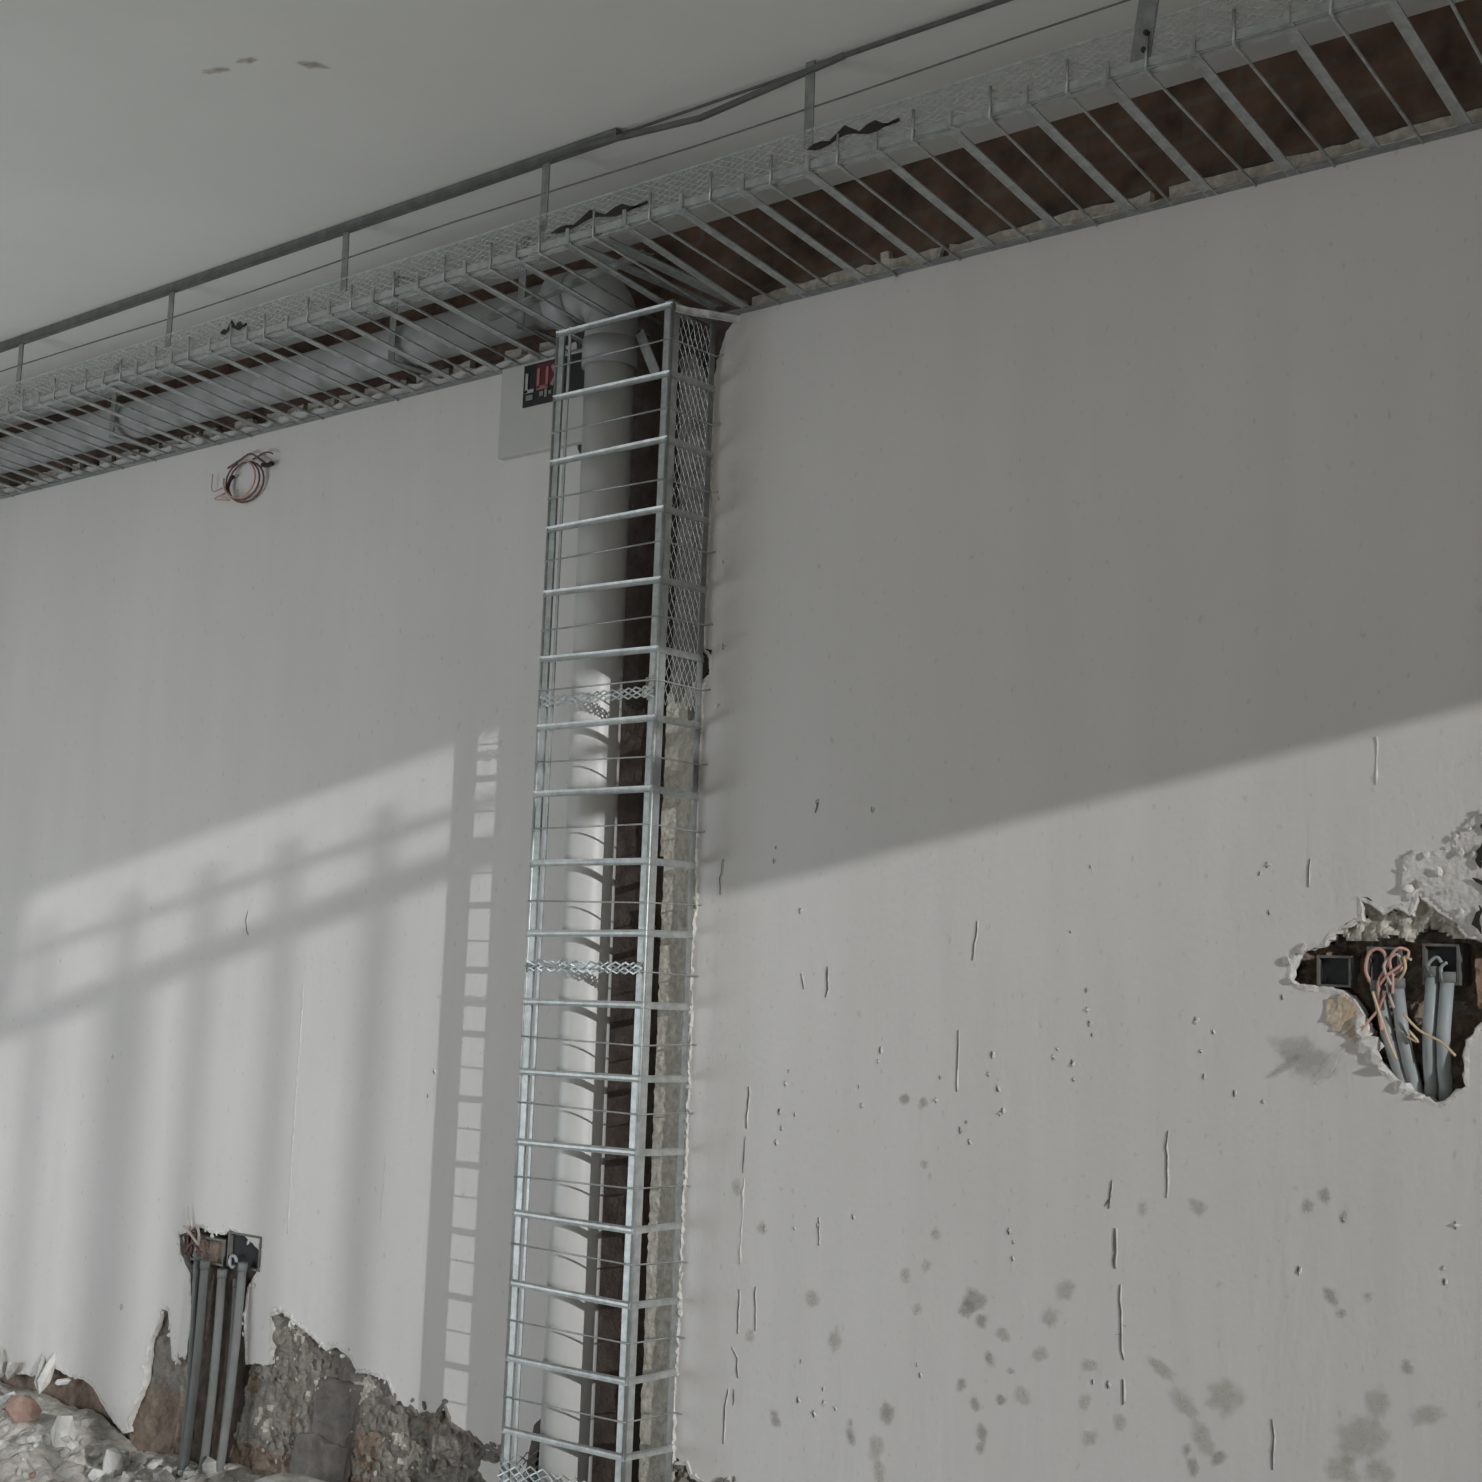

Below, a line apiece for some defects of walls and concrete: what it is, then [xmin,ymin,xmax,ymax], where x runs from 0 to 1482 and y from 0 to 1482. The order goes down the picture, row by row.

spalling [1281,808,1482,1108]
flaking render [6,1223,501,1482]